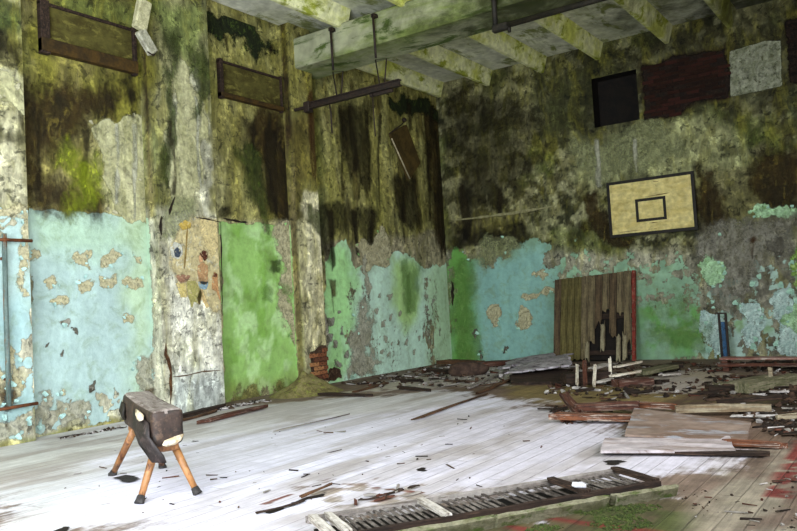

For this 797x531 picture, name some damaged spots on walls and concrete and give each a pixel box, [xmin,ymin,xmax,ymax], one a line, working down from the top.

water stain [19,74,135,217]
corrosion [308,90,316,176]
water stain [308,100,382,270]
water stain [582,190,633,249]
flaking render [572,48,731,187]
water stain [693,164,729,231]
water stain [748,152,797,209]
peeling [72,248,144,294]
peeling [309,226,402,382]
flaking render [696,203,797,359]
peeling [0,346,96,440]
peeling [131,355,154,391]